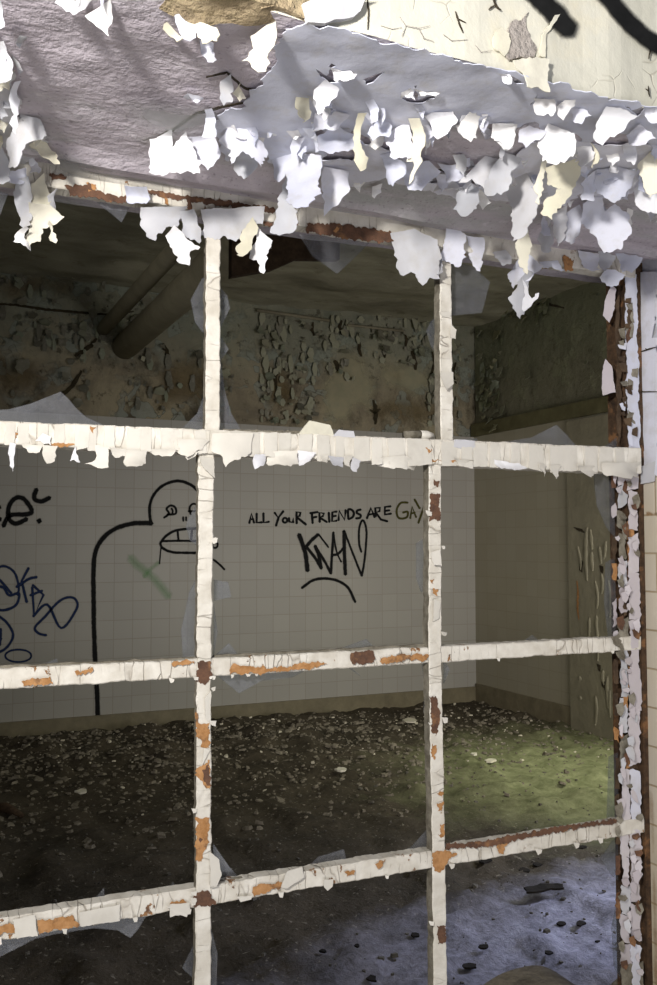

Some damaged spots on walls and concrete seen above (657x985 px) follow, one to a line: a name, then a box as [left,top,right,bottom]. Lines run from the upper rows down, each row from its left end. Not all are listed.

crack [367,0,493,53]
rust [49,173,127,204]
rust [147,189,276,227]
rust [306,222,394,244]
peeling [0,0,657,557]
rust [171,659,213,685]
peeling [611,556,644,976]
rust [432,818,617,873]
peeling [13,915,38,939]
peeling [79,904,120,927]
peeling [166,891,197,917]
rust [170,890,216,907]